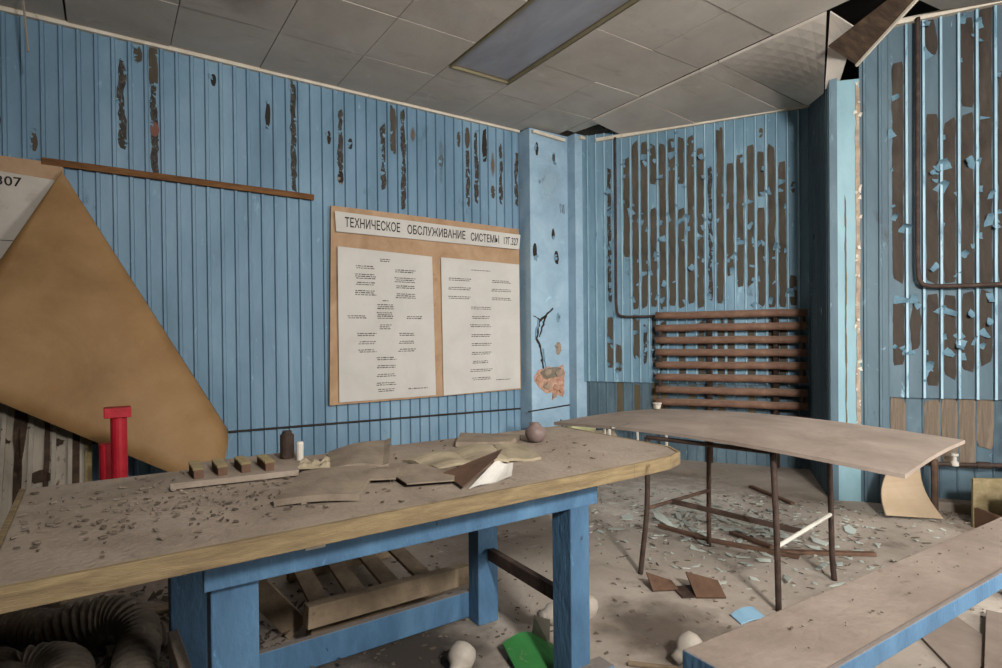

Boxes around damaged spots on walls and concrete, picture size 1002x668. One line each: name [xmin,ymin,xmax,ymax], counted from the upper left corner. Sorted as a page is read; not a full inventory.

peeling [116,44,160,173]
peeling [289,80,298,192]
peeling [326,109,352,184]
peeling [380,105,408,210]
peeling [457,127,519,209]
peeling [888,7,1002,386]
peeling [605,122,798,413]
crack [533,307,553,370]
spalling [534,342,565,400]
peeling [890,397,906,431]
peeling [924,399,994,468]